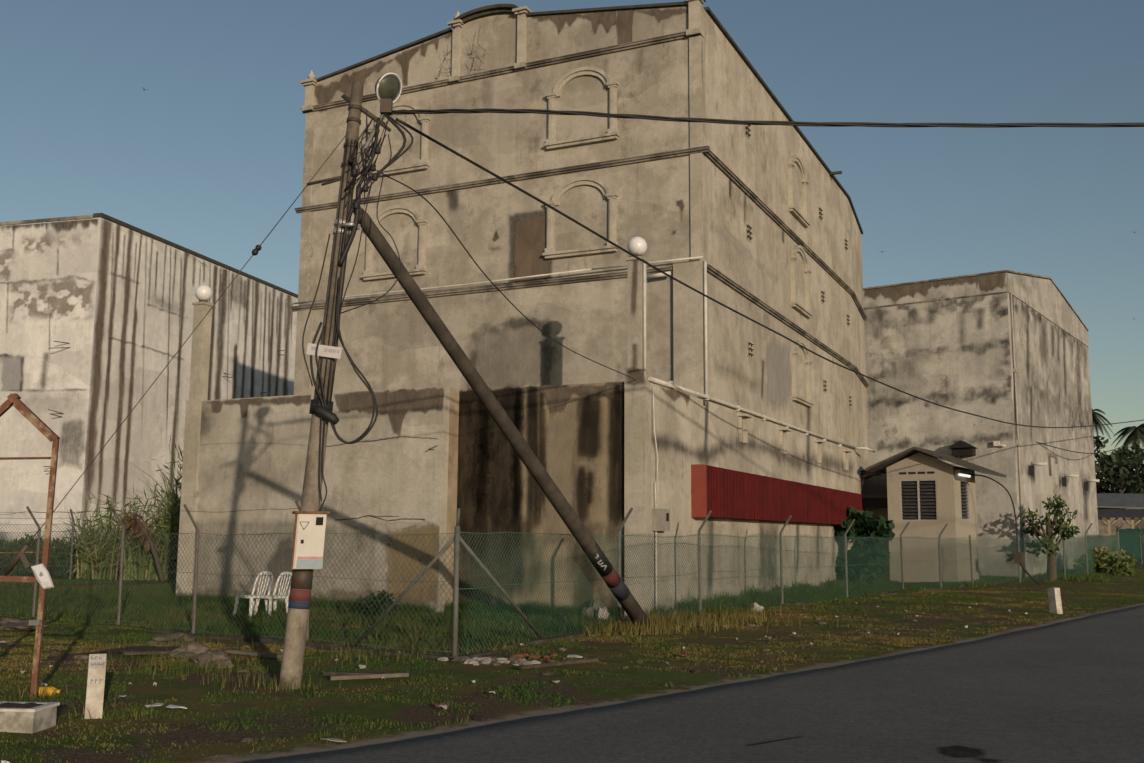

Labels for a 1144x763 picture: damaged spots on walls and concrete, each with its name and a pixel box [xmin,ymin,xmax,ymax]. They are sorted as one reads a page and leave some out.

leakage [532,8,689,45]
peeling [0,252,93,316]
leakage [864,273,1082,391]
leakage [200,395,311,432]
leakage [335,388,444,434]
leakage [491,345,645,533]
leakage [971,337,1029,441]
leakage [457,389,545,604]